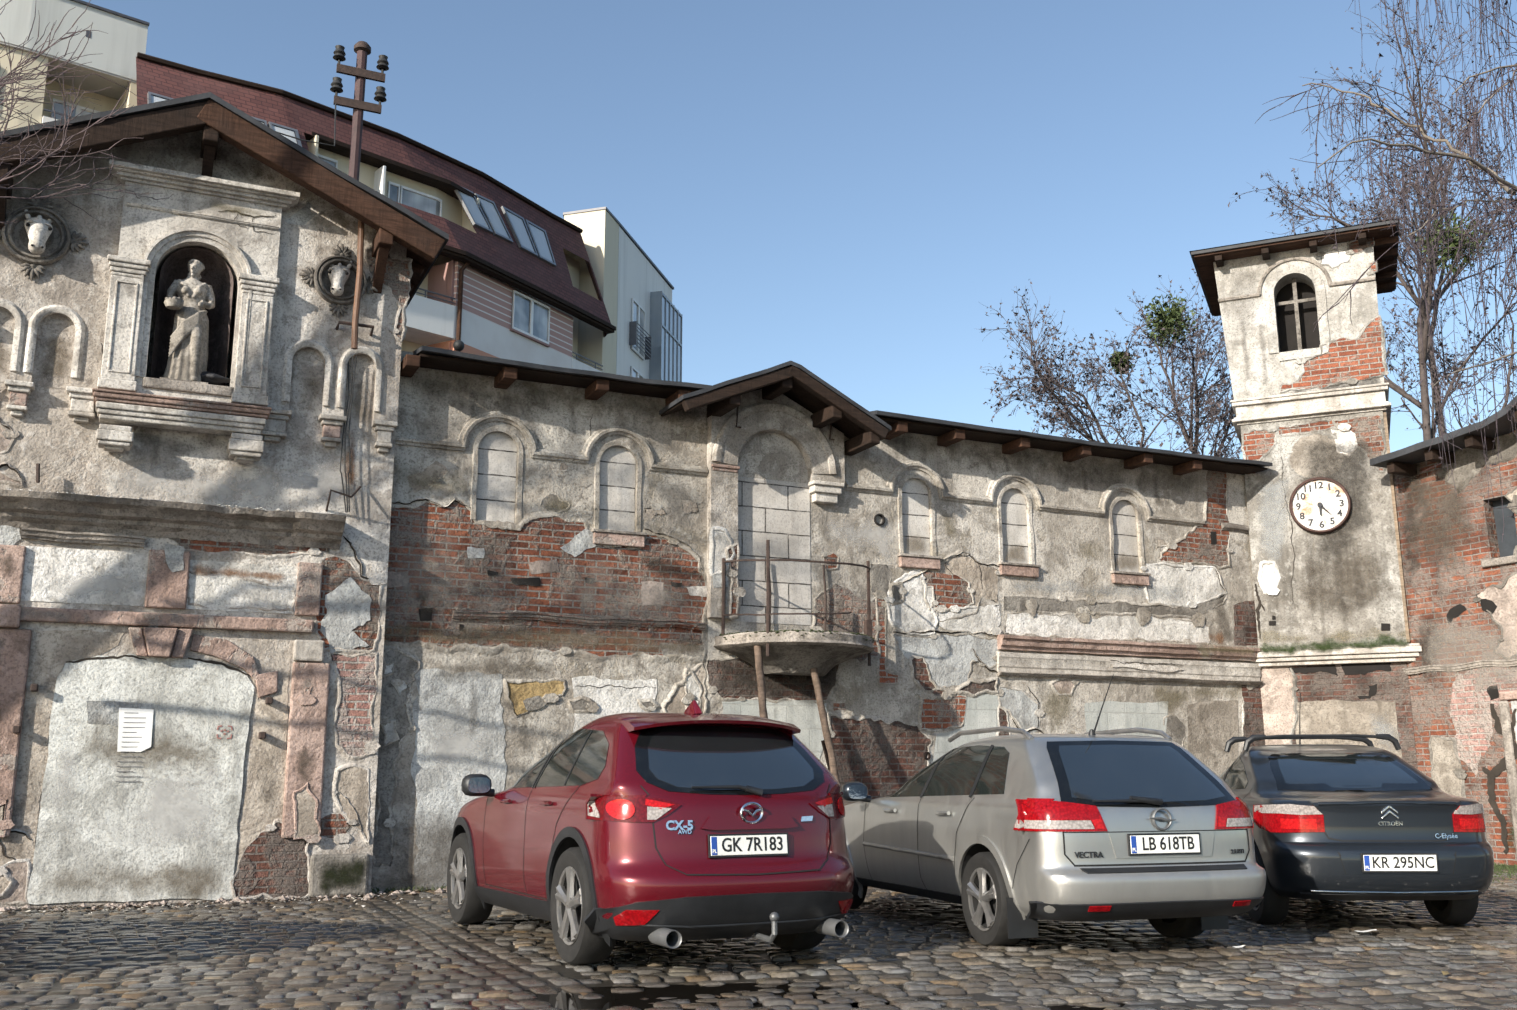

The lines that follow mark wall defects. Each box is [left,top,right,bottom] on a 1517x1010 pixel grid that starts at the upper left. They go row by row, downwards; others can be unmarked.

flaking render [1279,315,1389,393]
flaking render [1446,546,1517,660]
flaking render [163,459,1258,901]
spalling [1487,686,1499,701]